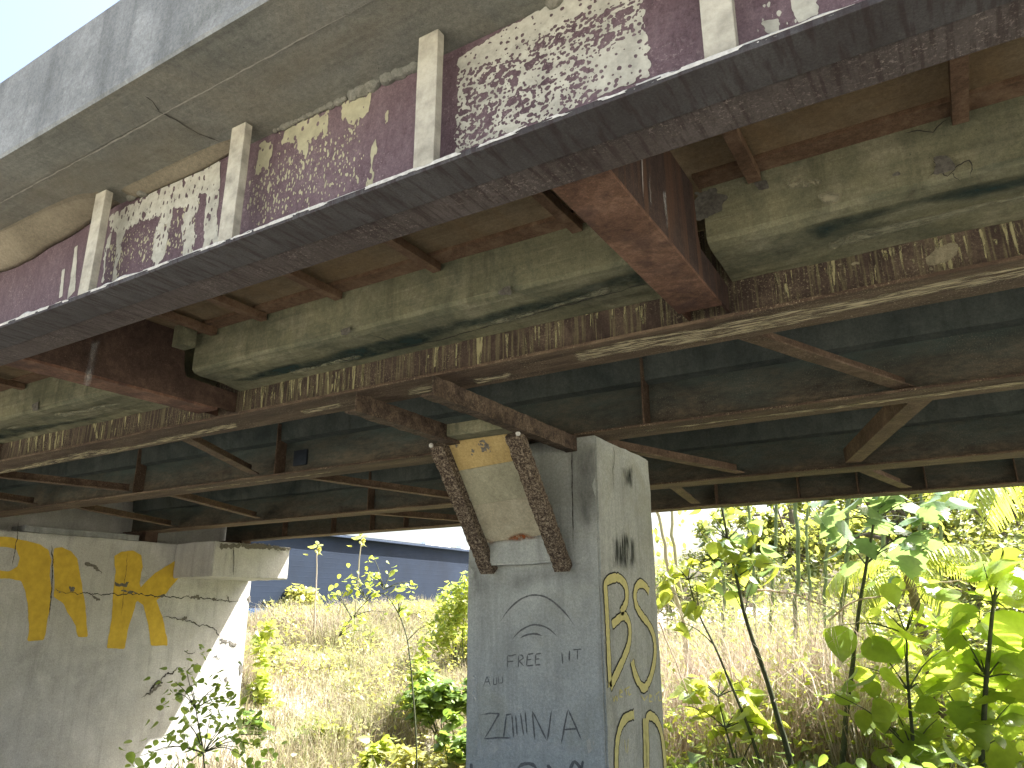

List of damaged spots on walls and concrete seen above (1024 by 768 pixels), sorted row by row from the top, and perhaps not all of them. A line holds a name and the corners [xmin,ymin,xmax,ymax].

peeling [791,0,819,23]
crack [0,4,365,203]
peeling [254,92,371,175]
peeling [365,0,779,190]
peeling [0,161,327,326]
water stain [813,178,1024,287]
water stain [238,274,644,410]
crack [49,547,251,697]